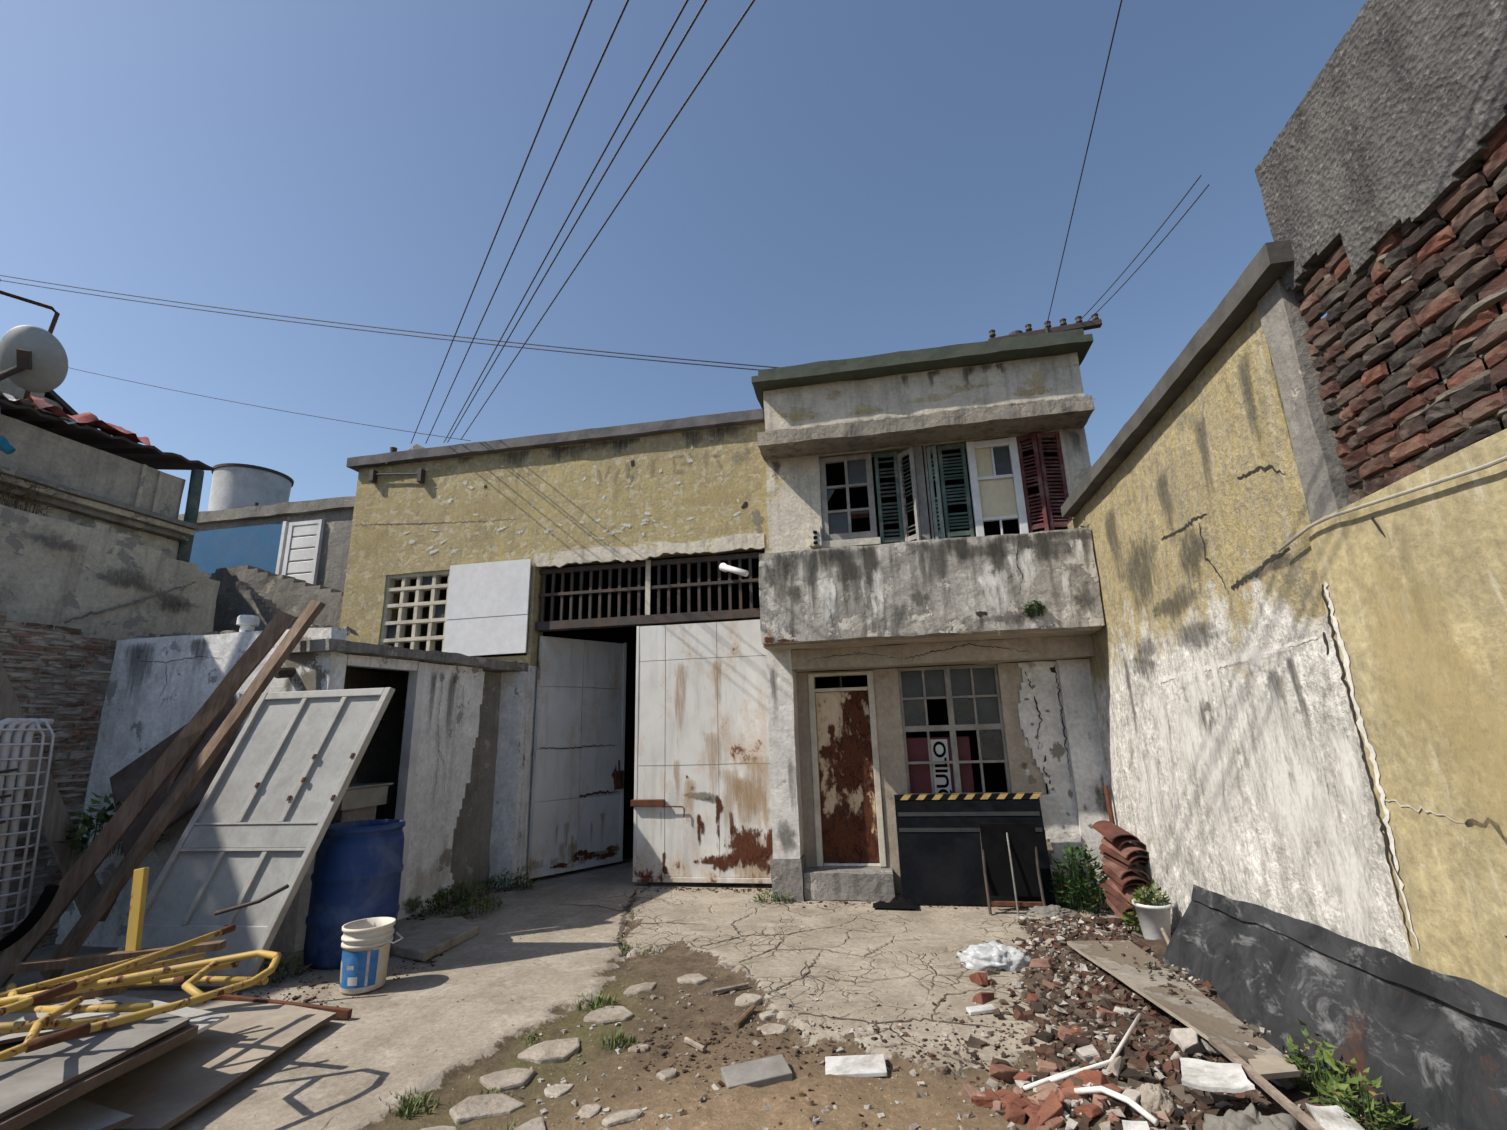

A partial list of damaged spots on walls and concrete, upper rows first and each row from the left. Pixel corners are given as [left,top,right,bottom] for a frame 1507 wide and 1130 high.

damp [1240,361,1254,412]
crack [1237,464,1284,479]
damp [765,546,884,620]
crack [1161,513,1289,592]
crack [1371,517,1385,537]
rust [579,766,617,798]
rust [815,684,880,863]
peeling [1023,671,1055,794]
damp [906,512,1376,944]
crack [1160,582,1507,949]
rust [550,845,618,869]
rust [694,795,773,875]